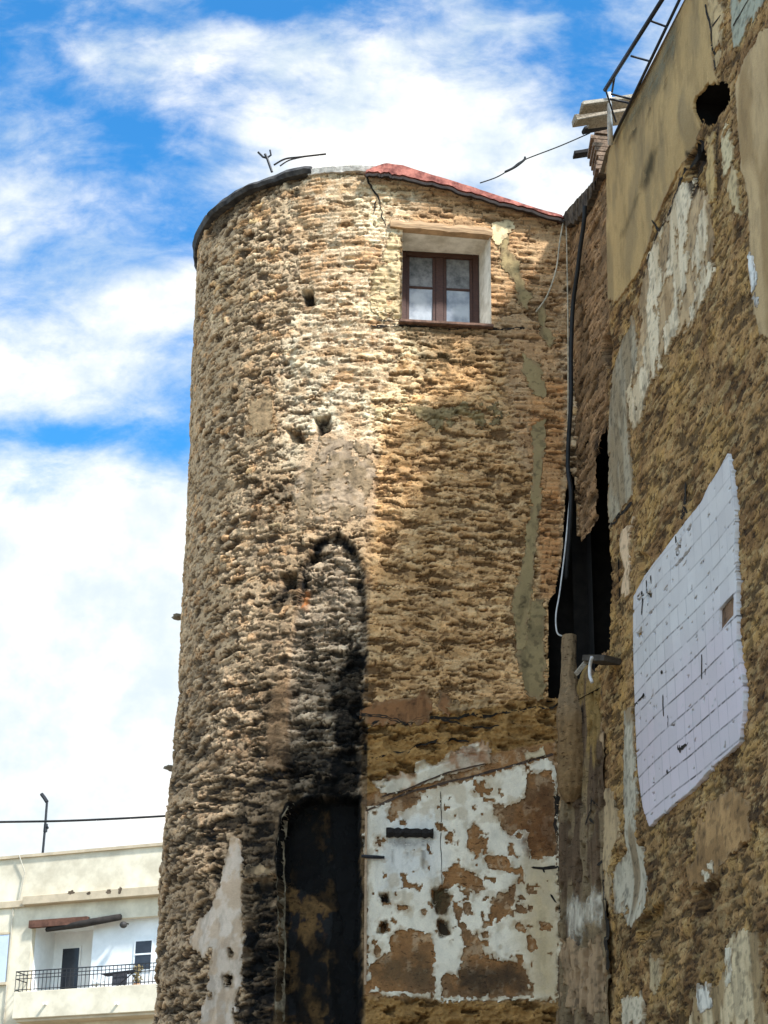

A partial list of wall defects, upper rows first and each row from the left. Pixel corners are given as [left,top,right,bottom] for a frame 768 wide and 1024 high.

crack [366,178,386,225]
peeling [571,123,743,679]
leakage [356,566,368,620]
peeling [189,836,271,1024]
leakage [285,756,364,1024]
peeling [362,739,608,1024]
peeling [602,706,648,928]
peeling [689,928,768,1024]